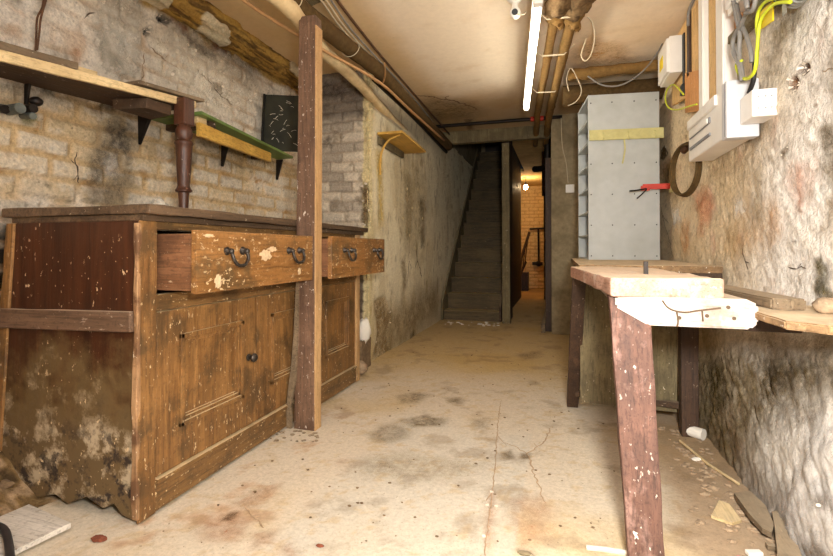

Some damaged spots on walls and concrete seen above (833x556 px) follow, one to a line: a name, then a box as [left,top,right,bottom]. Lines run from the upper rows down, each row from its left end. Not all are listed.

damp [815,258,831,298]
crack [480,399,553,556]